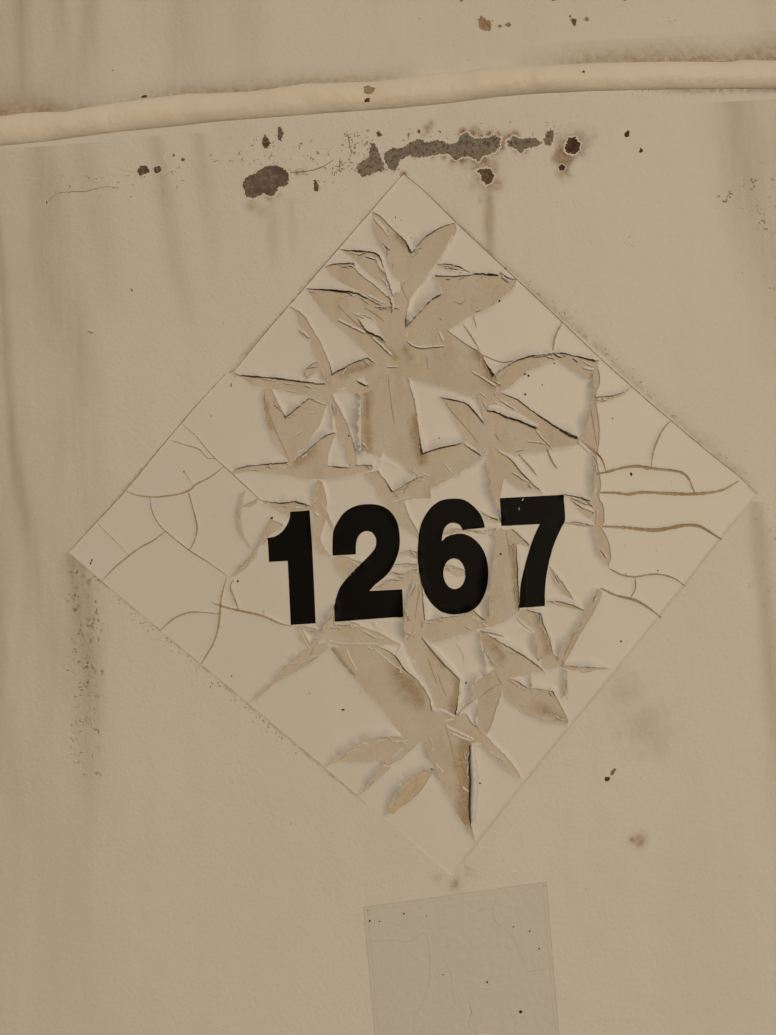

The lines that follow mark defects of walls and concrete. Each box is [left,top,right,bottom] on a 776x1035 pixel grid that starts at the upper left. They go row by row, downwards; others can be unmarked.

peeling [240,124,292,201]
peeling [357,130,385,177]
peeling [507,130,584,172]
crack [581,421,738,496]
crack [98,424,291,664]
peeling [231,212,632,846]
crack [602,524,722,540]
crack [601,568,685,618]